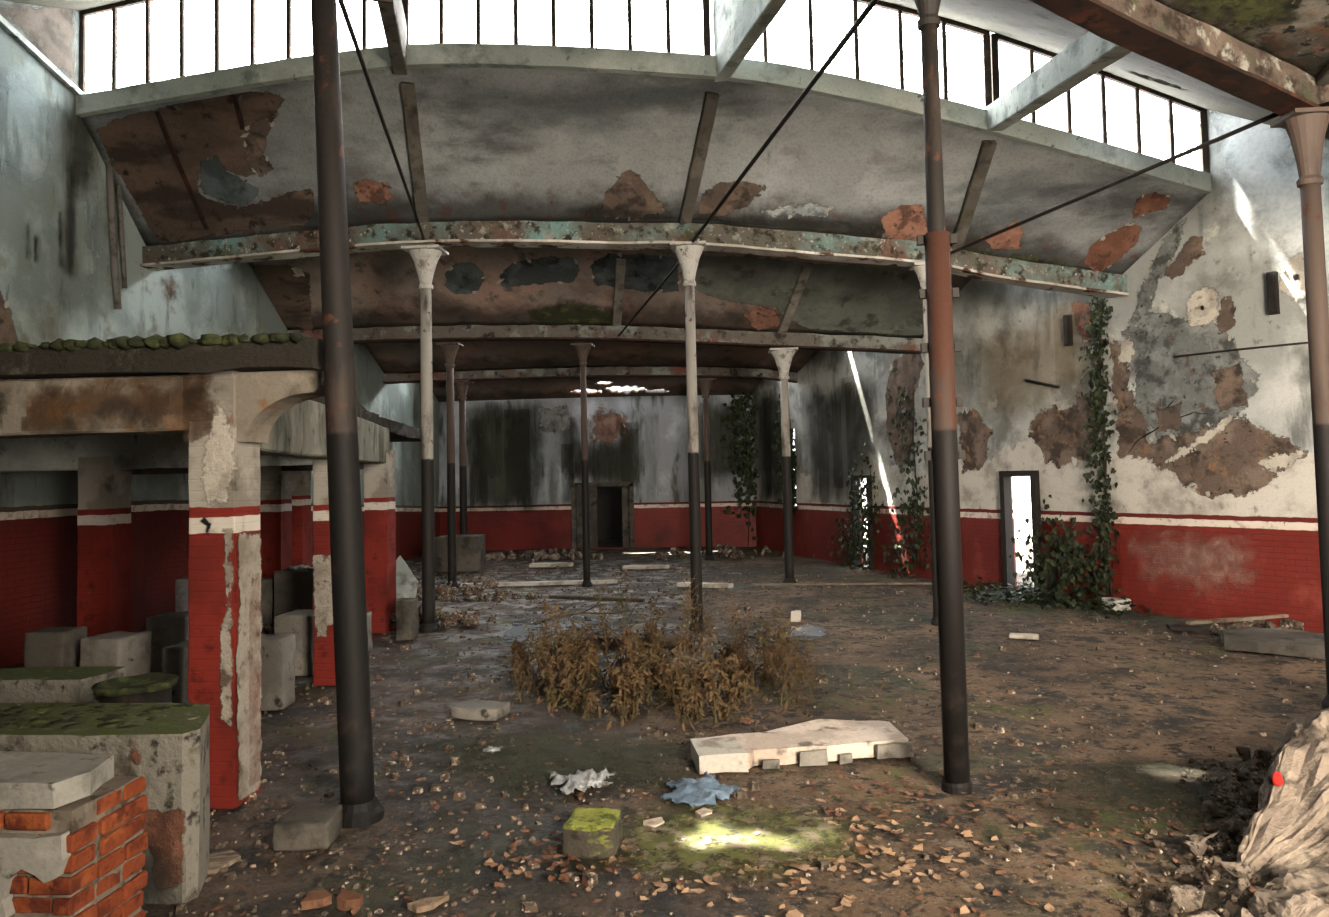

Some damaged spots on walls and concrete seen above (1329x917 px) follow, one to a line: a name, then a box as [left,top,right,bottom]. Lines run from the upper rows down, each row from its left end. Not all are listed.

flaking render [241,113,278,183]
flaking render [603,170,665,222]
flaking render [698,181,834,219]
flaking render [879,204,927,241]
flaking render [1084,192,1170,271]
flaking render [0,291,18,344]
flaking render [1028,218,1309,500]
leakage [466,403,544,511]
leakage [563,427,645,502]
flaking render [885,354,925,465]
flaking render [956,406,993,474]
flaking render [219,529,263,801]